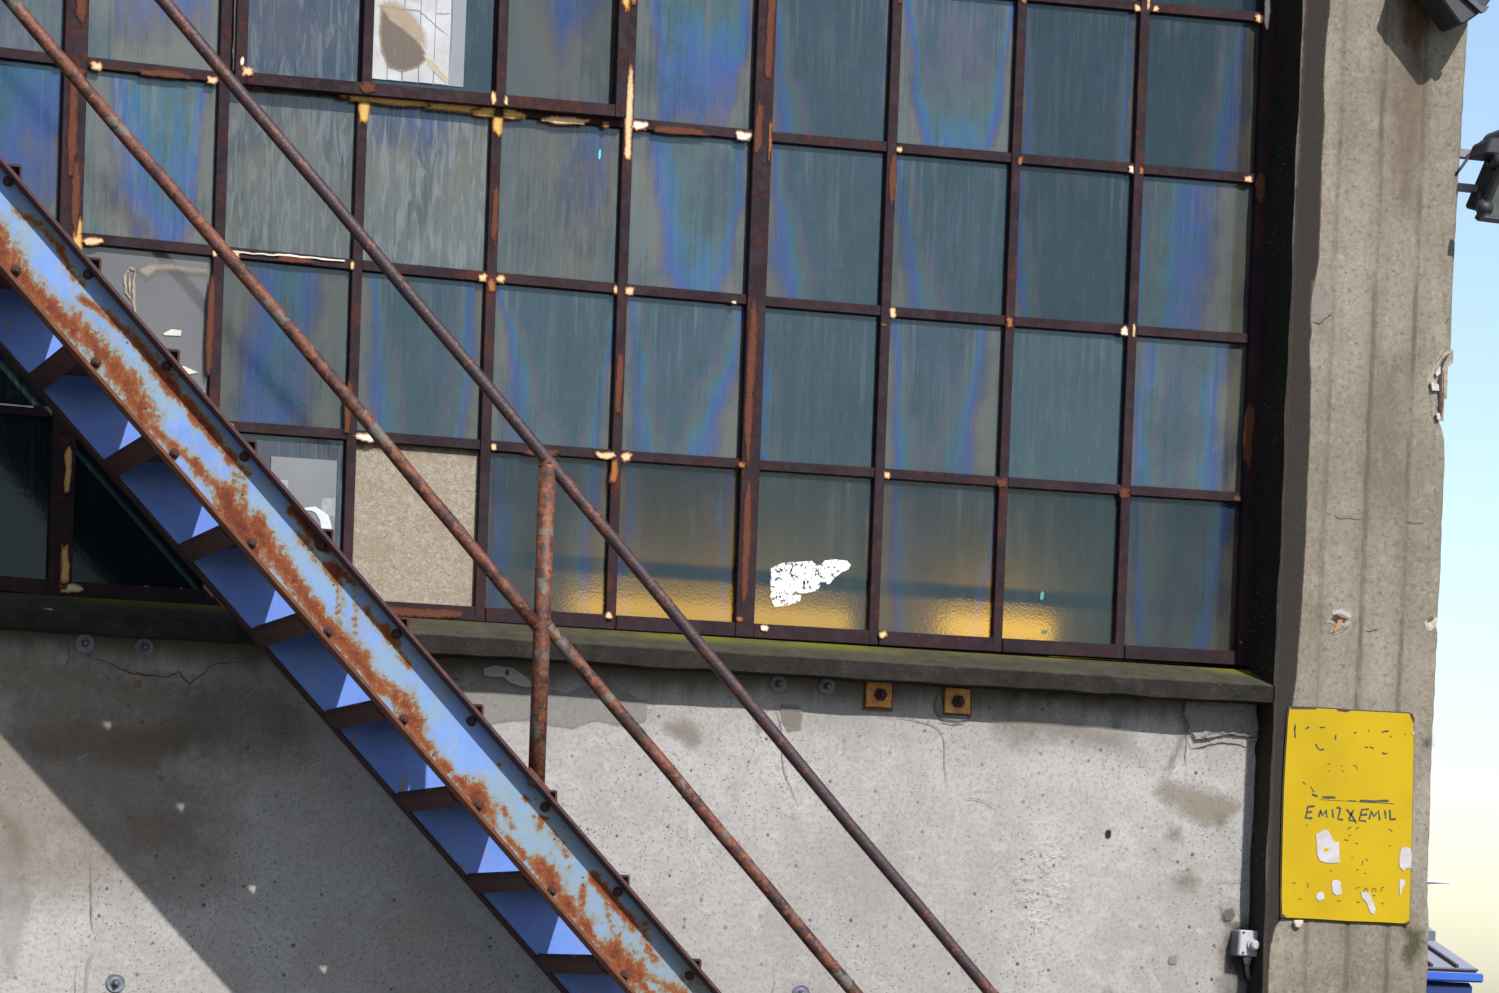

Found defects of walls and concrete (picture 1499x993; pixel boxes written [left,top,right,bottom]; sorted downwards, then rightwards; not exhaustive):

rust [764,0,776,79]
rust [67,68,86,236]
peeling [348,91,590,137]
rust [754,100,773,161]
rust [889,155,897,206]
rust [491,186,499,247]
rust [615,353,624,414]
spalling [1426,349,1454,421]
rust [609,459,619,484]
rust [736,300,758,622]
spalling [1326,609,1352,638]
crack [64,650,252,685]